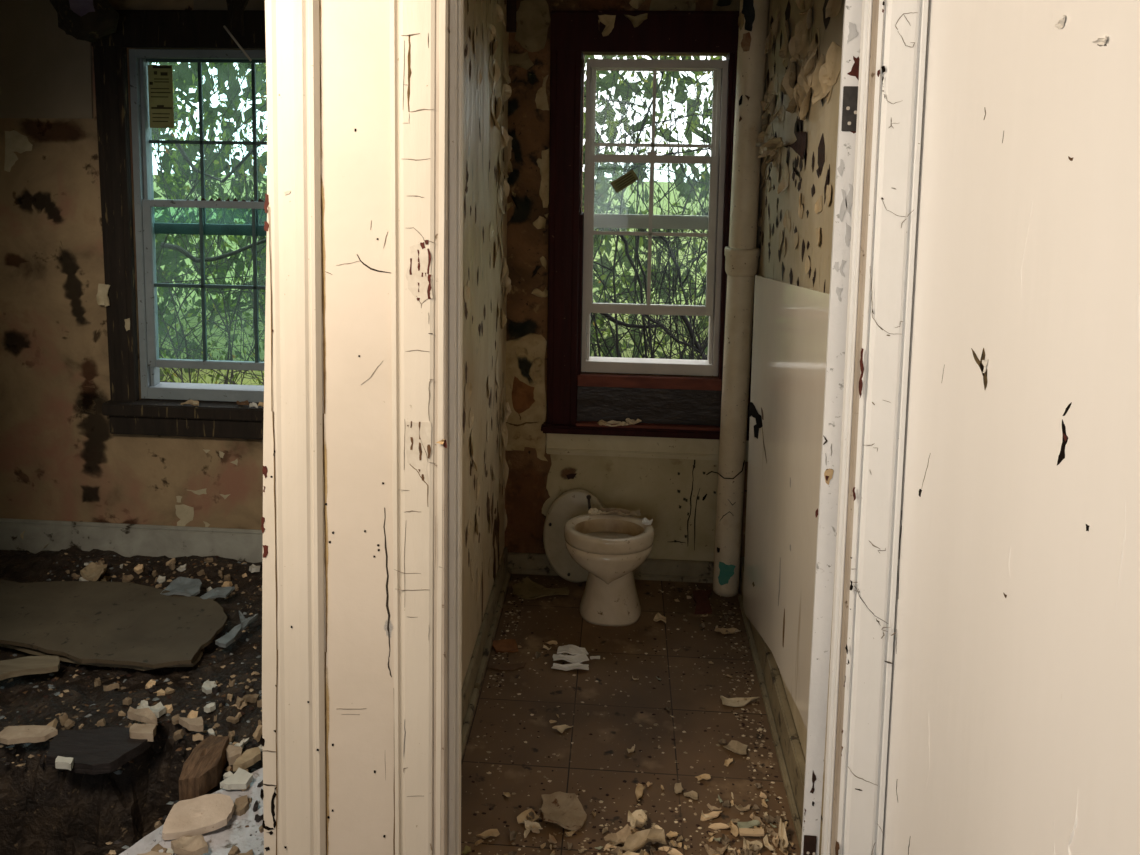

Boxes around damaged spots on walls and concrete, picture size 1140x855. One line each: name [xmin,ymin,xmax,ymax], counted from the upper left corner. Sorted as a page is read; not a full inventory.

leakage [21,119,84,141]
peeling [739,0,860,302]
leakage [18,190,63,223]
leakage [4,331,30,356]
leakage [58,251,86,324]
peeling [96,284,110,307]
peeling [406,227,436,307]
peeling [463,0,736,618]
leakage [75,361,111,502]
peeling [823,436,834,485]
crack [383,490,442,677]
crack [385,721,411,855]